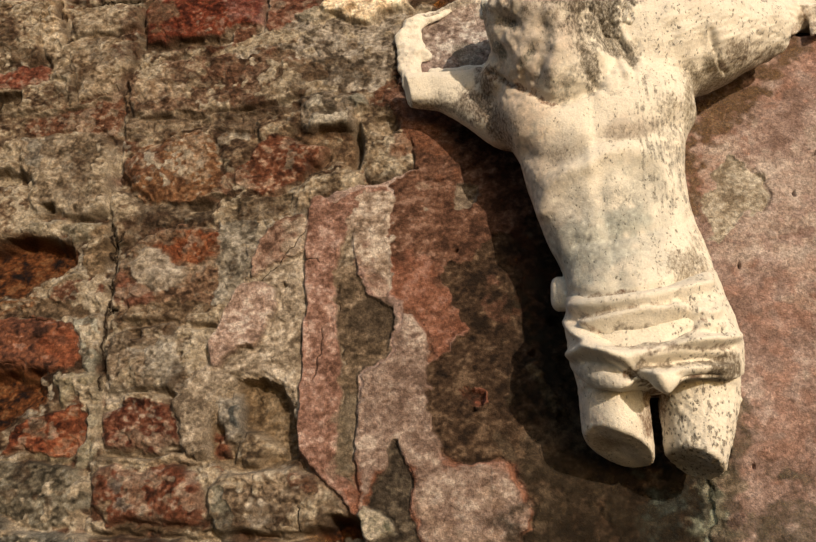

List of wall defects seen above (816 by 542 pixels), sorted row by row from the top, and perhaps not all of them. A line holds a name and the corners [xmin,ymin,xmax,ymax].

crack [97,224,124,391]
crack [260,231,319,282]
flaking render [113,82,719,542]